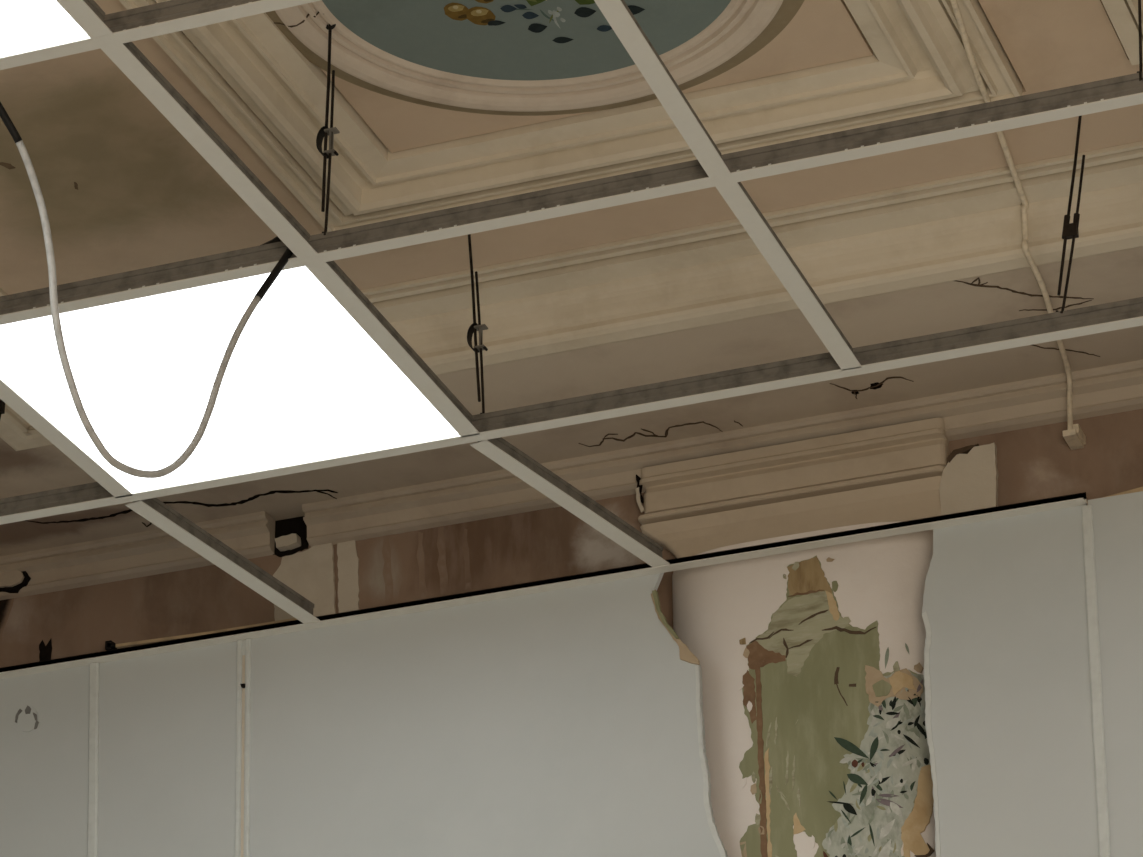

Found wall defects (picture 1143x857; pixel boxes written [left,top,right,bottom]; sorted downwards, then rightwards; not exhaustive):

crack [955,277,1094,311]
crack [830,377,914,399]
crack [578,421,743,447]
crack [24,489,338,527]
peeling [737,555,924,857]